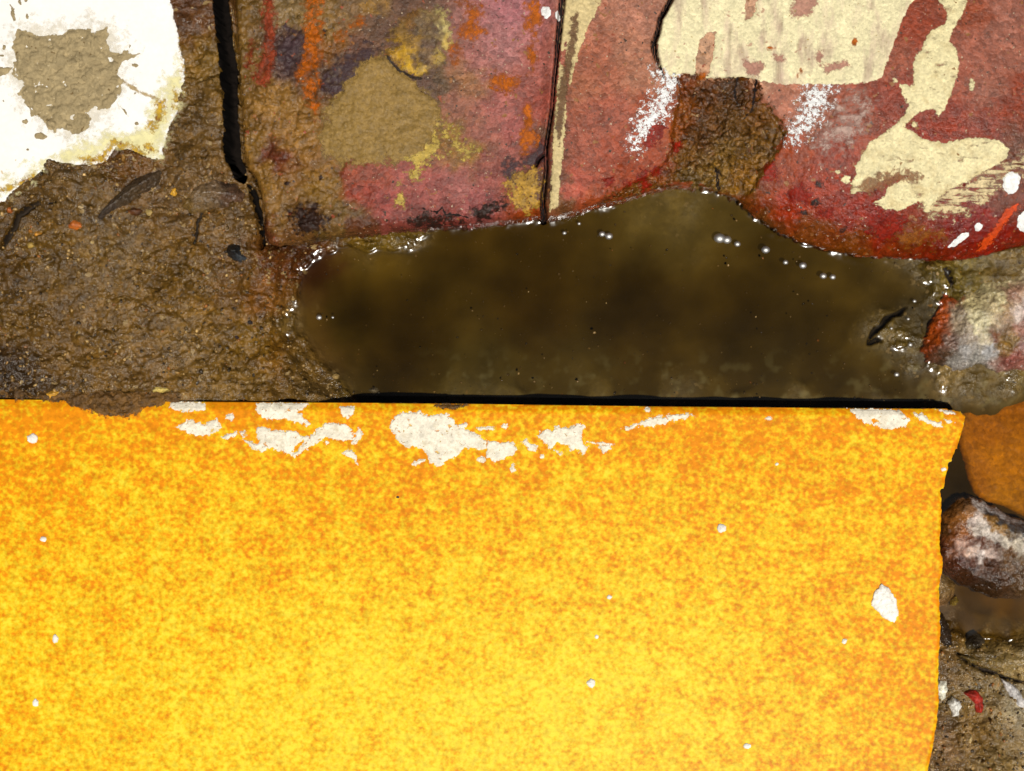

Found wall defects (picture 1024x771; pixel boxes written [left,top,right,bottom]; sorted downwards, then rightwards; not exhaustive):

crack [651,0,673,79]
peeling [816,51,850,74]
crack [212,0,266,250]
crack [536,0,566,225]
water stain [623,63,685,160]
spalling [595,72,835,219]
water stain [287,202,331,244]
water stain [402,196,509,233]
peeling [152,387,363,465]
peeling [389,410,613,473]
peeling [625,407,696,431]
peeling [850,408,955,430]